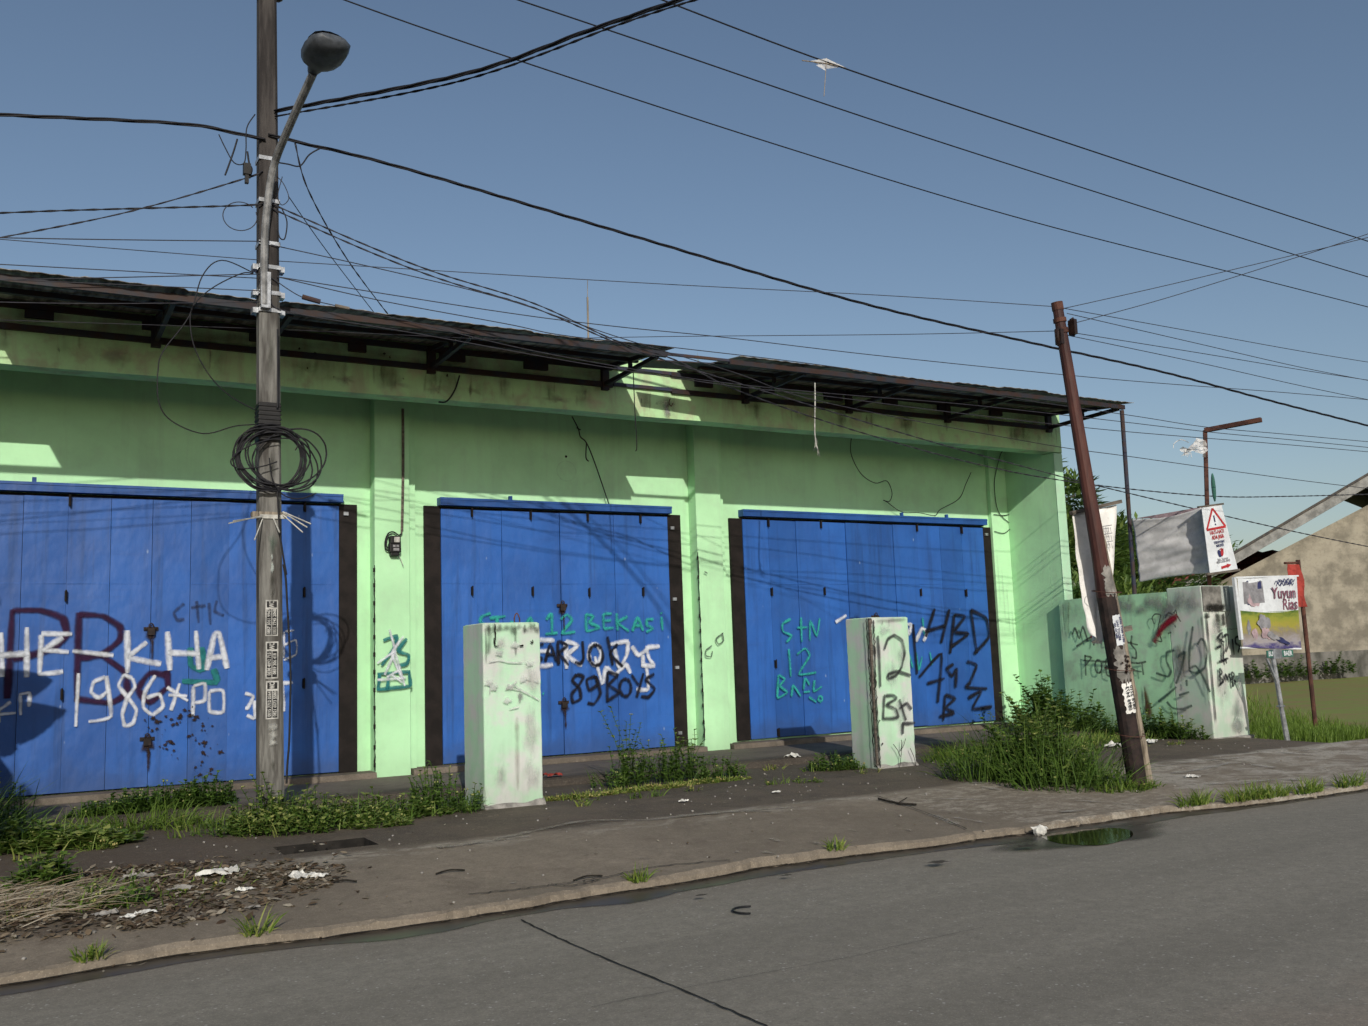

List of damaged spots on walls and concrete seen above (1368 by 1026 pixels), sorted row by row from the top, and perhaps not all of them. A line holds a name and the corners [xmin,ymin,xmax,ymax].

leakage [1118,595,1226,719]